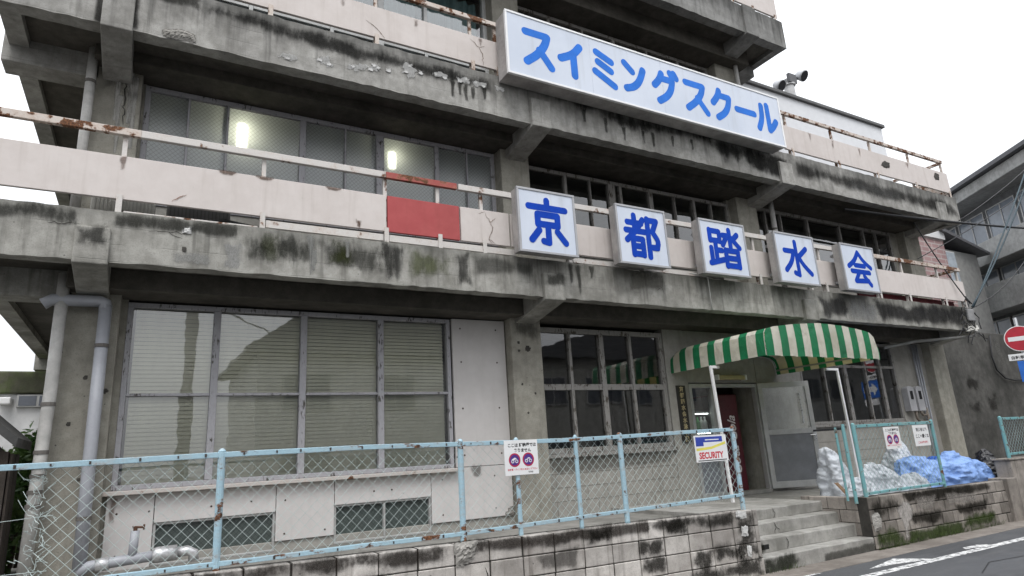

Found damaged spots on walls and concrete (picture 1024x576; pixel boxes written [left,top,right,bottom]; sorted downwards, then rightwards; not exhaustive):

peeling [347,62,504,92]
leakage [603,111,956,213]
leakage [0,203,75,221]
leakage [80,226,105,242]
leakage [116,215,403,276]
leakage [458,254,526,282]
leakage [548,264,593,288]
leakage [820,298,966,325]
leakage [458,512,798,576]